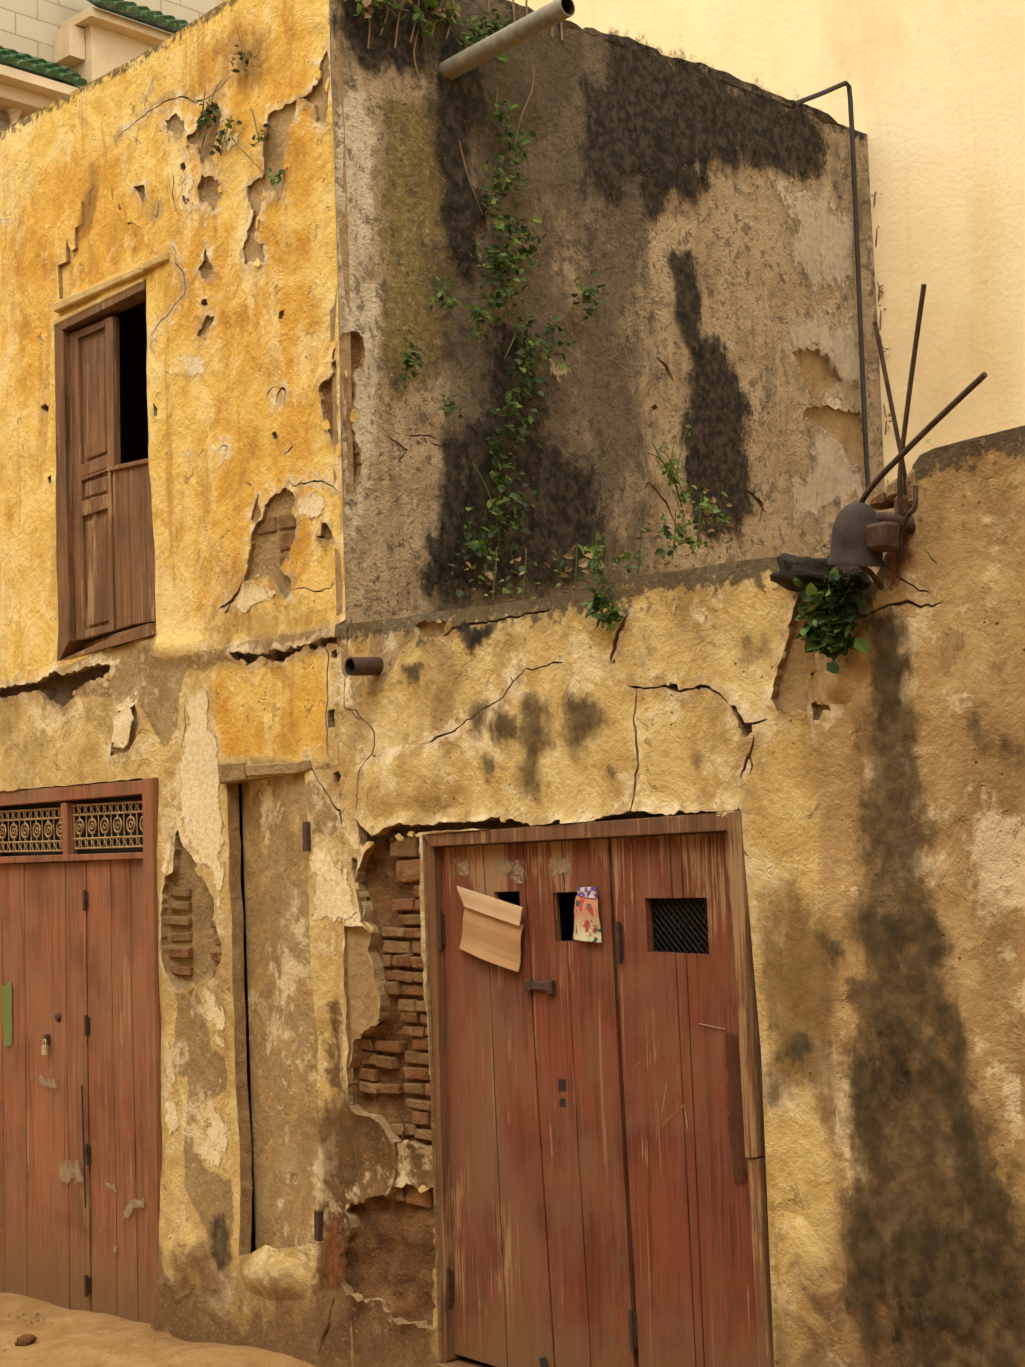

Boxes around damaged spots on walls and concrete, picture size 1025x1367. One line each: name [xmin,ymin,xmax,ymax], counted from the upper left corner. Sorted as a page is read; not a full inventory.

spalling [167,68,330,267]
water stain [578,30,856,298]
water stain [668,249,757,540]
water stain [784,315,861,387]
spalling [237,489,333,613]
spalling [0,665,111,707]
peeling [111,706,140,755]
crack [632,685,721,695]
spalling [778,598,831,719]
peeling [160,688,227,1048]
spalling [310,816,572,1148]
water stain [764,611,1025,1367]